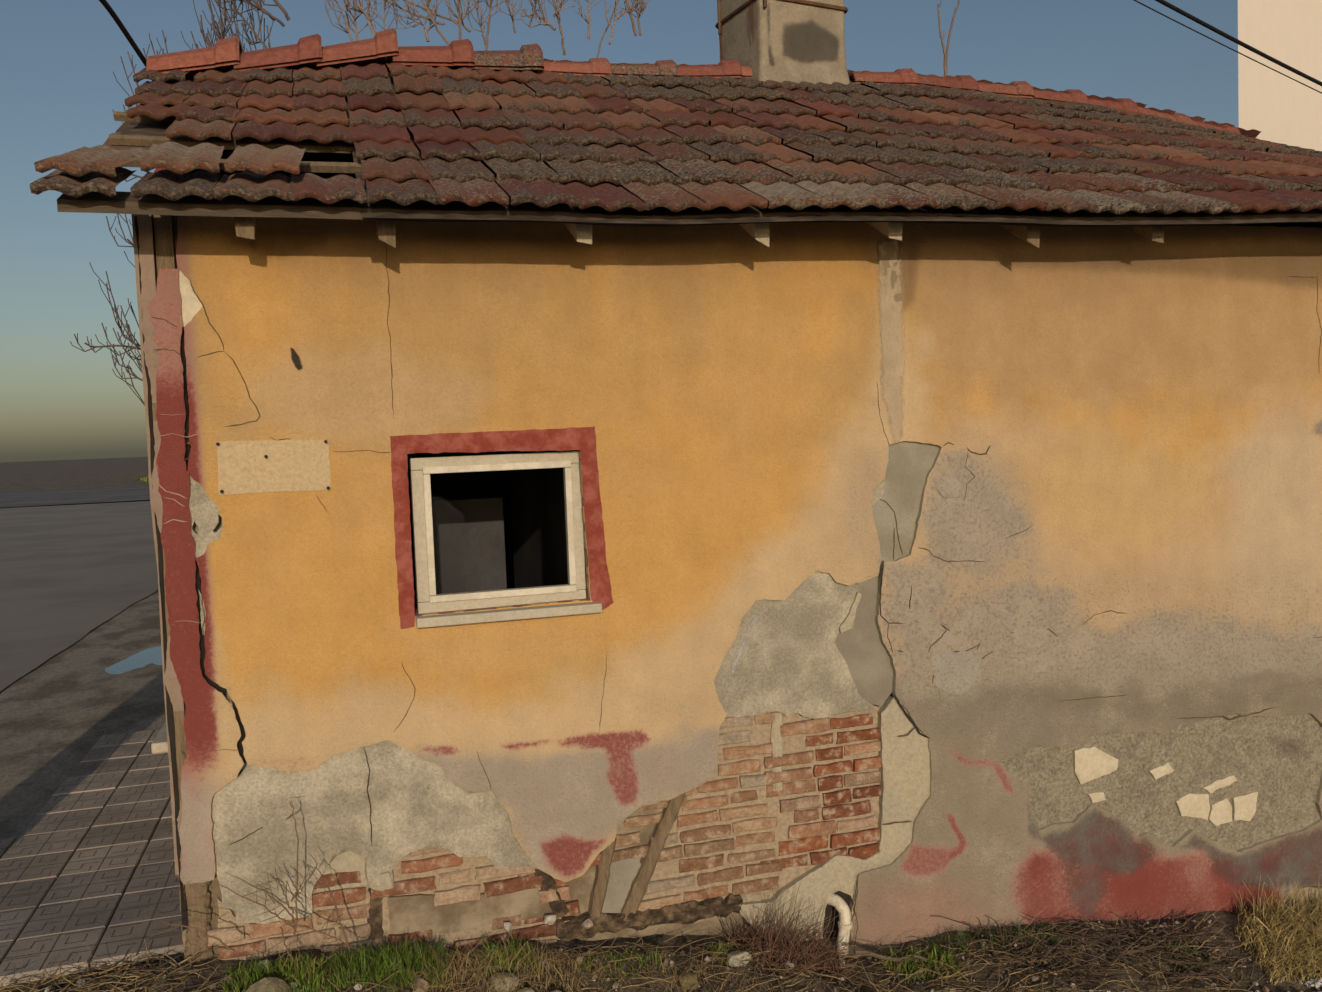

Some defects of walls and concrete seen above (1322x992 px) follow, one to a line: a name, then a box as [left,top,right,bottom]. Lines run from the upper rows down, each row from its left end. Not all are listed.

spalling [189,475,224,558]
crack [134,216,289,931]
spalling [212,740,538,924]
spalling [714,441,940,942]
spalling [998,713,1322,850]